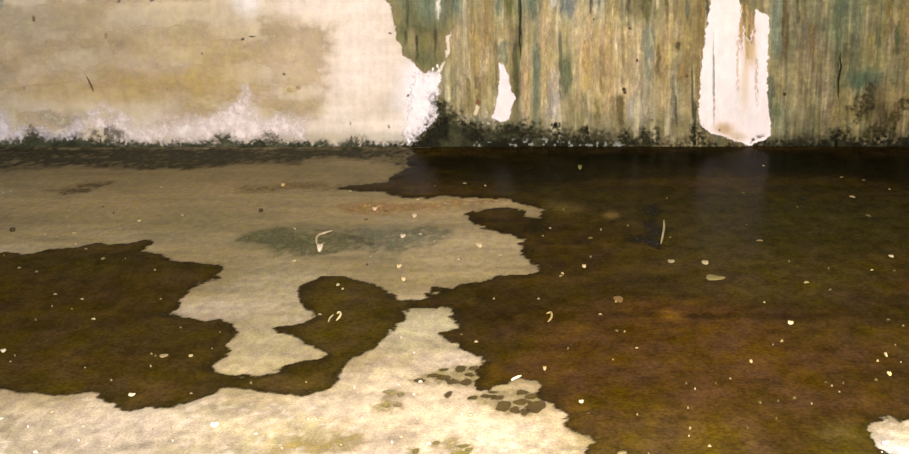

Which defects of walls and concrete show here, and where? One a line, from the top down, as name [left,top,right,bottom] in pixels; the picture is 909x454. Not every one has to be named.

peeling [402,64,442,145]
leakage [0,0,909,170]
peeling [473,42,516,125]
peeling [698,0,771,146]
leakage [237,226,449,255]